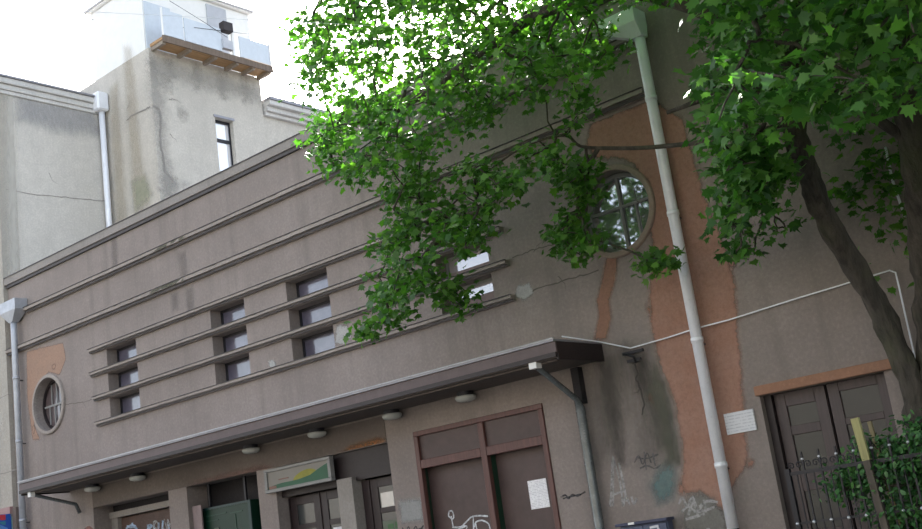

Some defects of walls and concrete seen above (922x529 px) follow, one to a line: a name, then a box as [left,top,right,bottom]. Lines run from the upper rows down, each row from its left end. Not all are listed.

crack [6,173,105,201]
crack [126,98,180,183]
peeling [586,102,754,489]
peeling [27,343,65,440]
peeling [647,267,726,529]